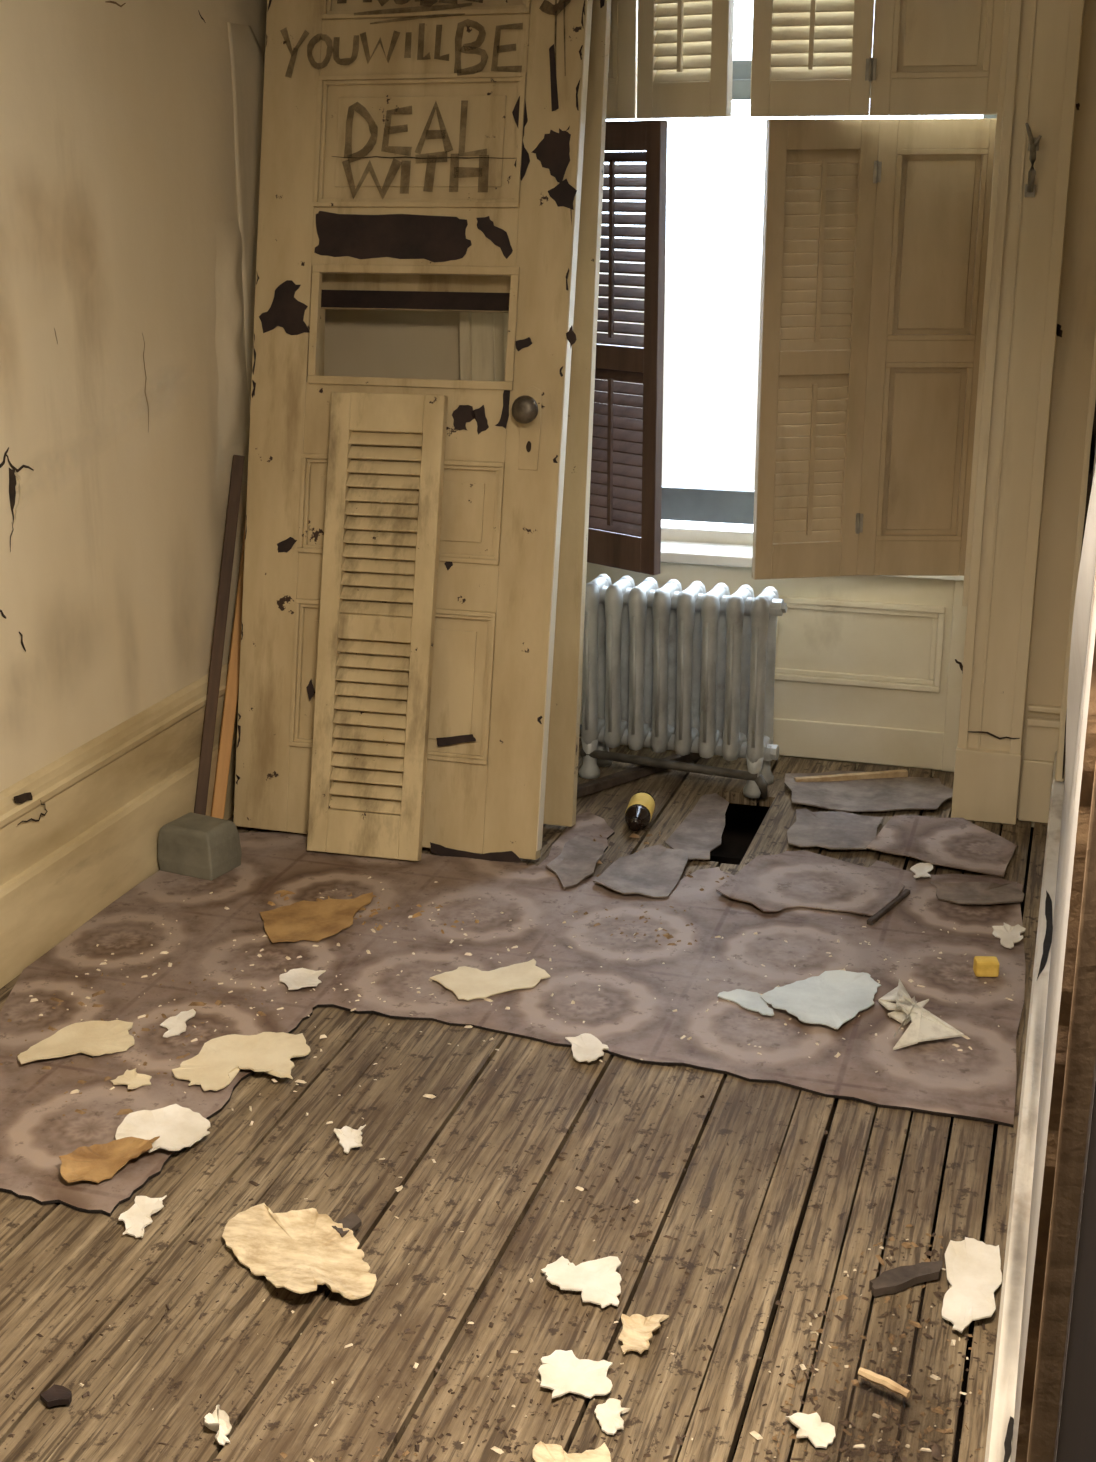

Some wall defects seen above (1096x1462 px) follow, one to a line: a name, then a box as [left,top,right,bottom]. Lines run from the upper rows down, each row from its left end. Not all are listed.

crack [0,447,34,552]